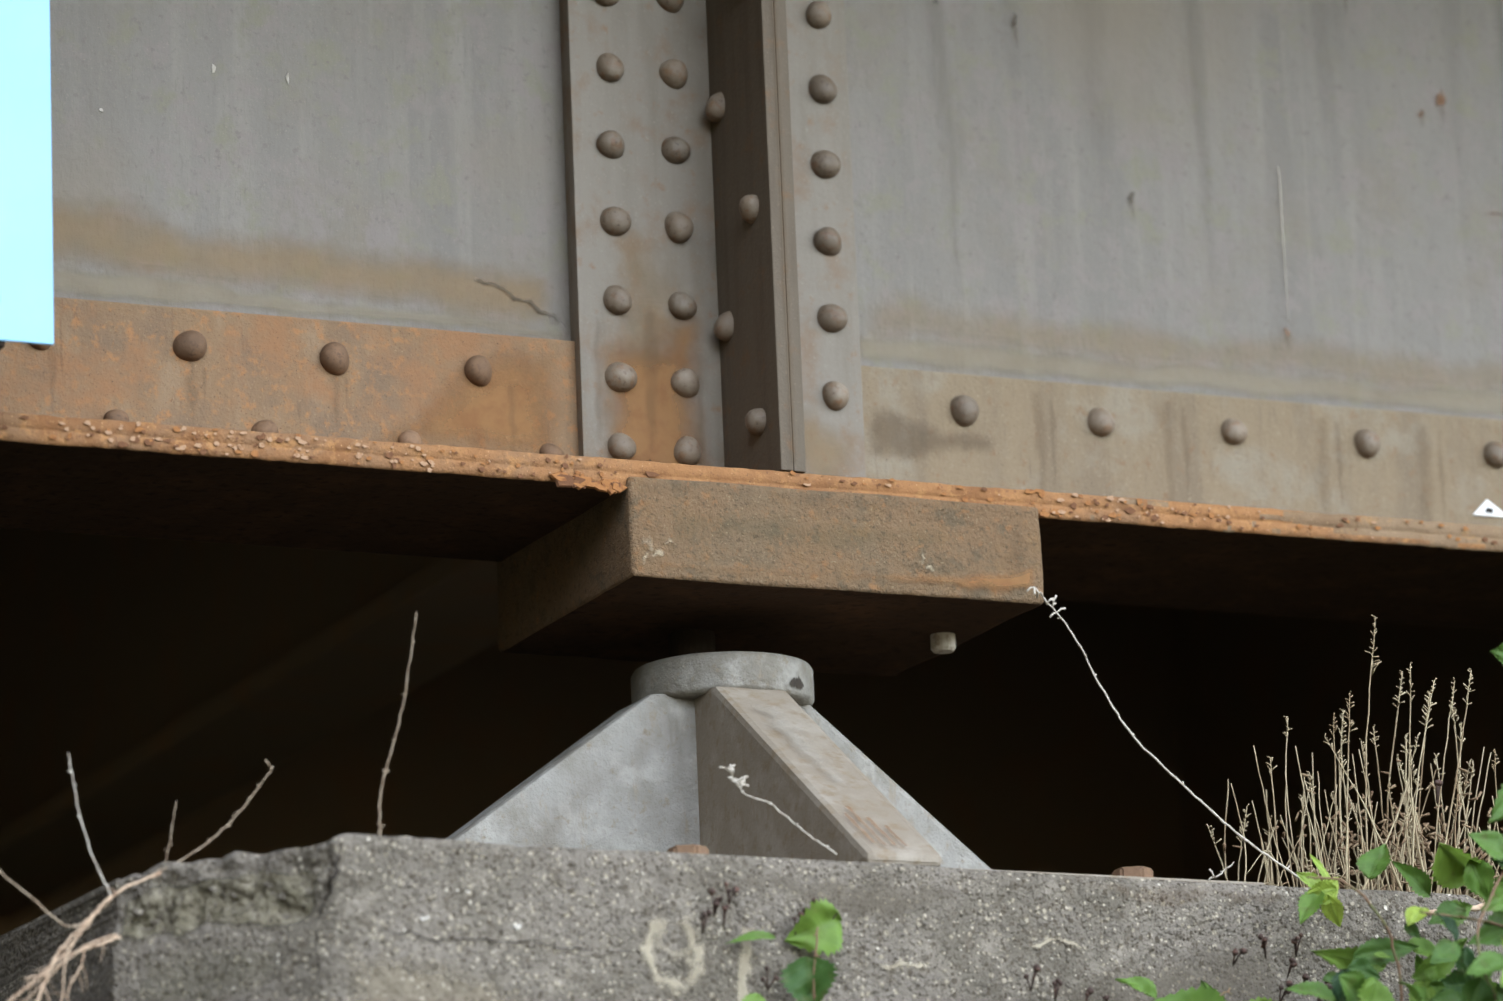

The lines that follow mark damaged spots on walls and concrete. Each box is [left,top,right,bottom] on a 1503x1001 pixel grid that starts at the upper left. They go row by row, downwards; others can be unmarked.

crack [478,279,558,319]
leakage [860,343,1503,412]
corrosion [347,330,691,495]
corrosion [49,420,327,460]
corrosion [1025,489,1313,533]
corrosion [921,571,1032,588]